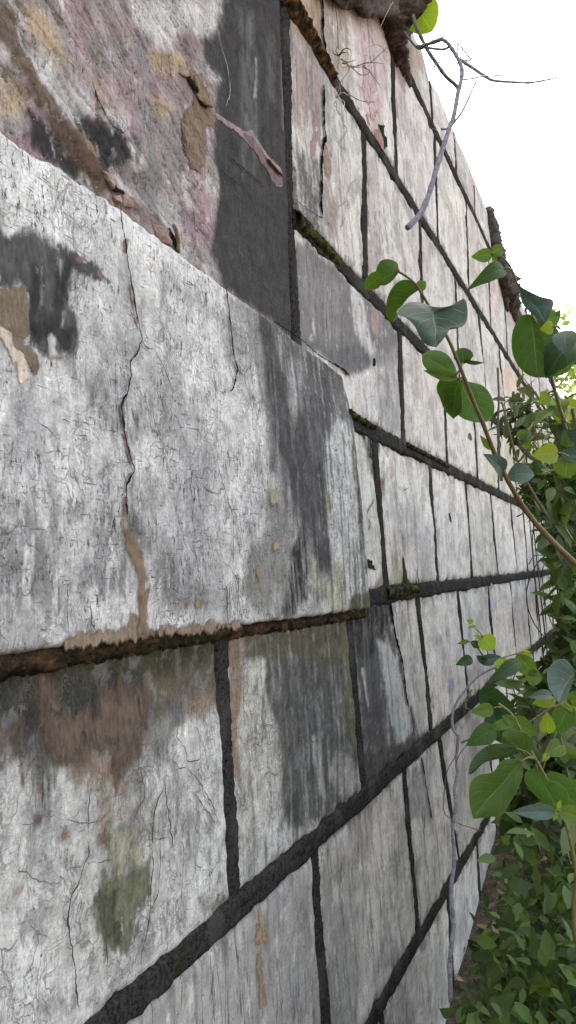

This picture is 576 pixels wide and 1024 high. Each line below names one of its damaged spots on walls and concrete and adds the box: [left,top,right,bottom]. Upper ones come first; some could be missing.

water stain [27,108,85,183]
water stain [74,115,132,173]
spalling [102,171,136,208]
spalling [152,223,181,253]
peeling [179,64,283,187]
peeling [0,284,40,384]
water stain [0,229,105,357]
crack [120,204,174,520]
crack [226,286,244,392]
crack [7,727,218,1007]